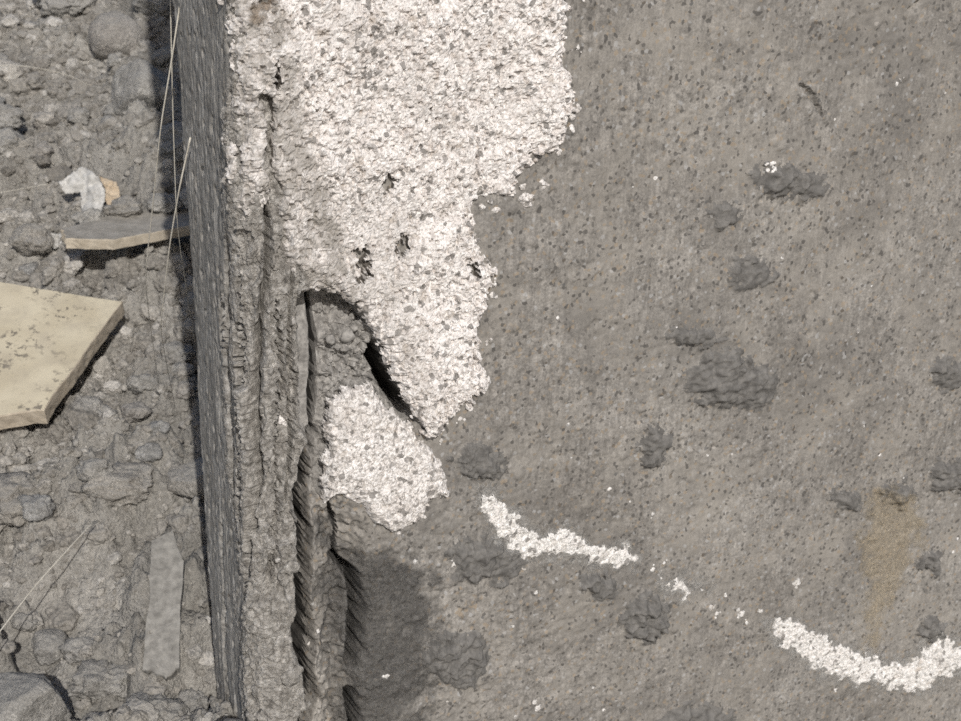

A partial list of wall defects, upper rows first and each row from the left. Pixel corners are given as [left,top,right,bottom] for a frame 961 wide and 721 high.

crack [290,291,338,721]
spalling [217,0,582,721]